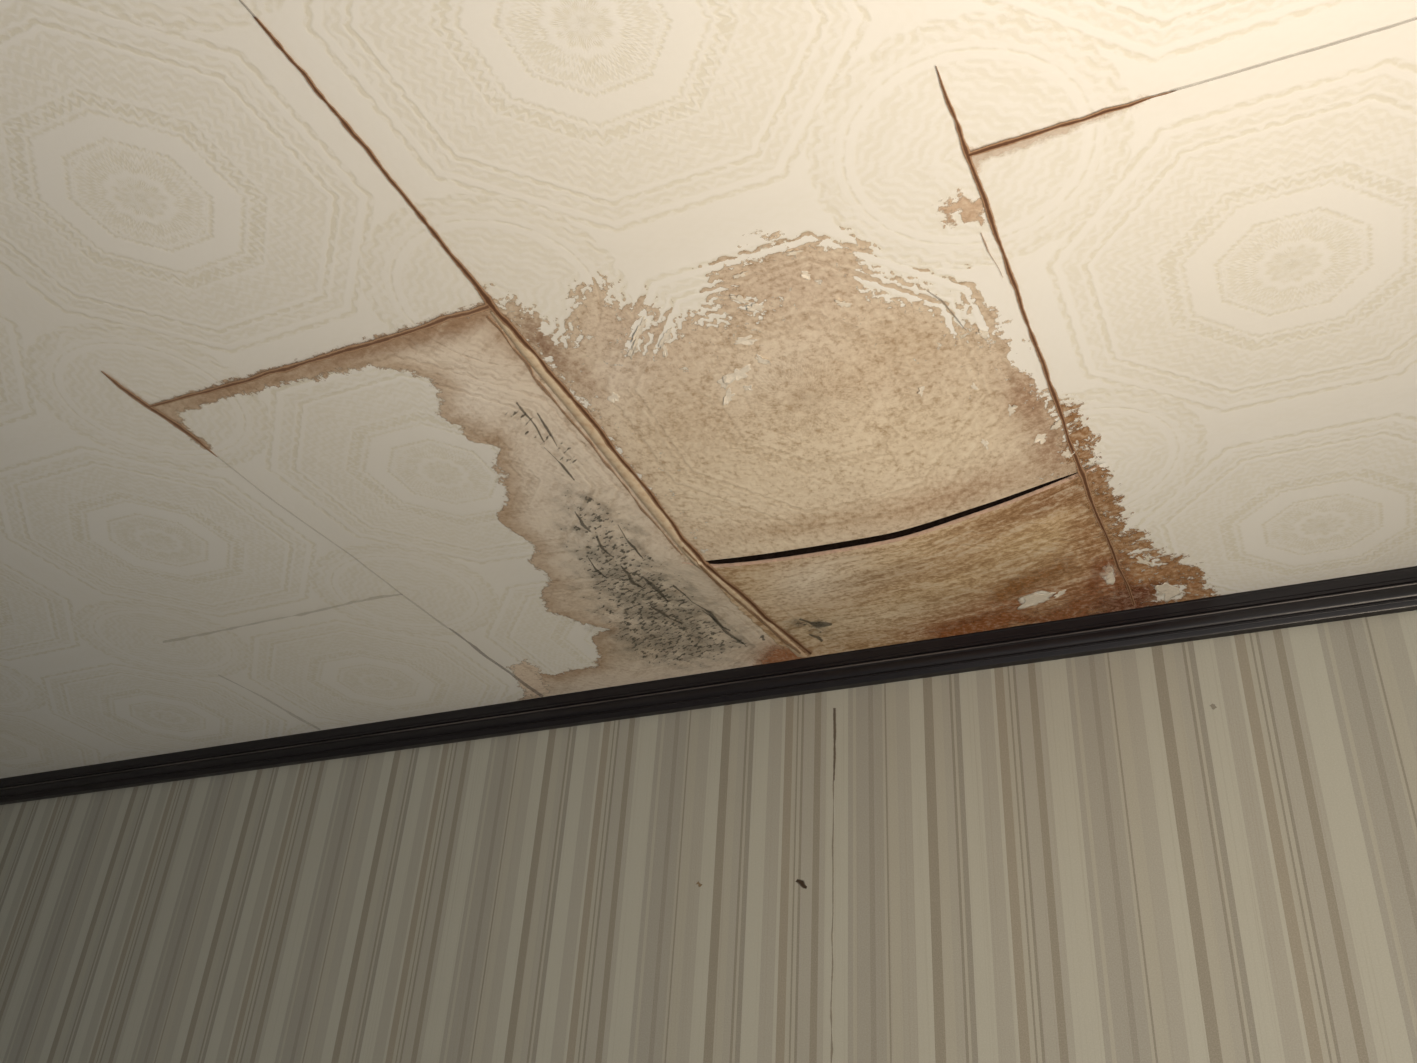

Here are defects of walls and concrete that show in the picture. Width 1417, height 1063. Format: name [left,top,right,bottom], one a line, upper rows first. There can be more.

crack [101,16,1177,657]
damp [153,226,1220,700]